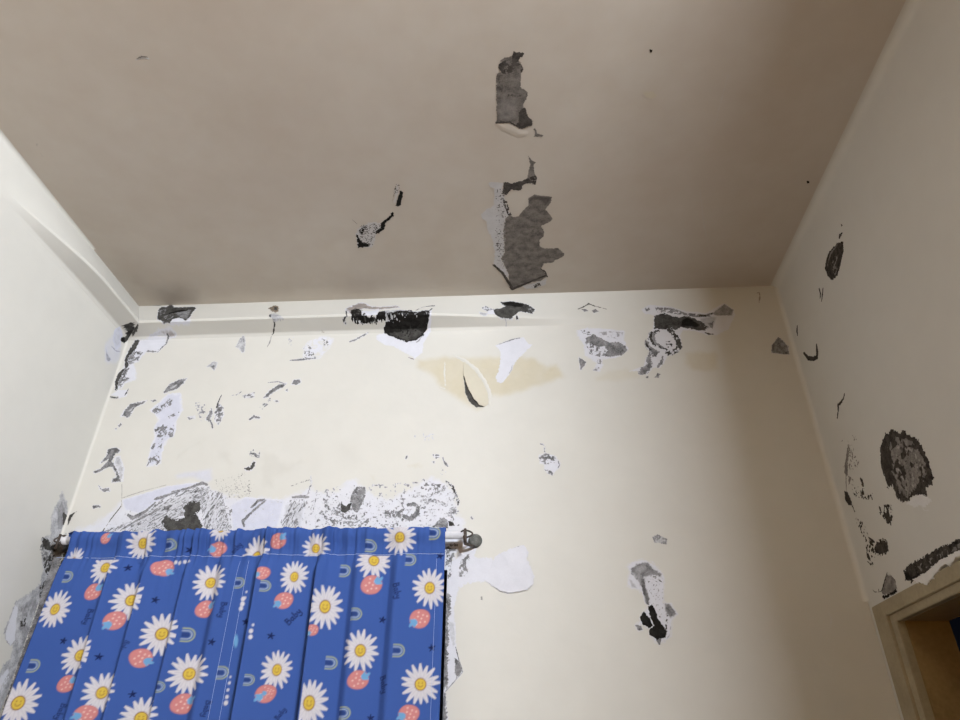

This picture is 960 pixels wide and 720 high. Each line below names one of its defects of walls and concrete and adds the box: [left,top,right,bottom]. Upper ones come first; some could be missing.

peeling [495,51,544,138]
peeling [479,156,565,326]
spalling [825,224,844,280]
peeling [103,305,302,468]
spalling [342,302,435,360]
leakage [413,353,568,415]
peeling [576,327,630,373]
peeling [629,303,736,379]
spalling [841,429,934,565]
peeling [0,446,535,720]
peeling [625,558,679,646]
spalling [873,539,960,599]